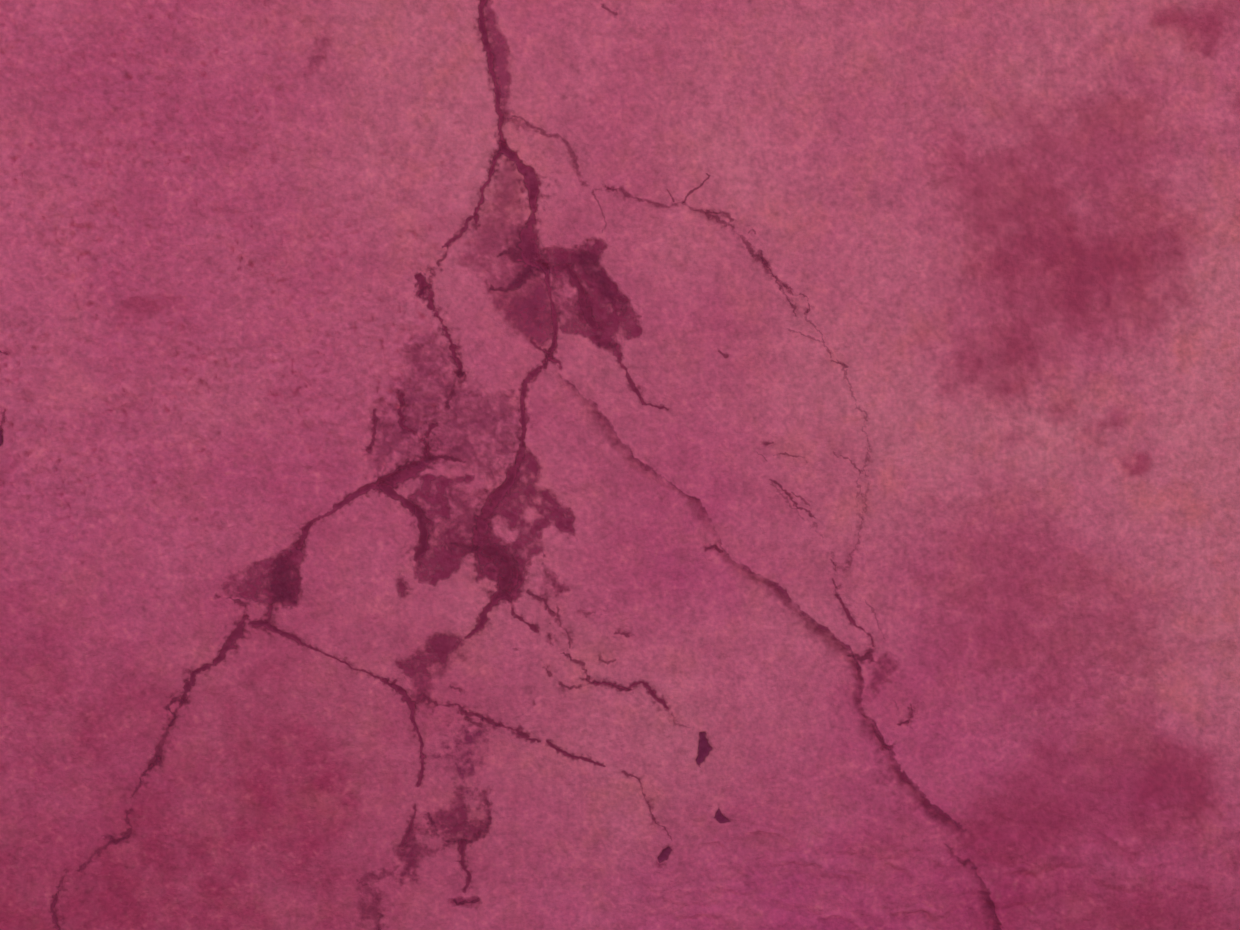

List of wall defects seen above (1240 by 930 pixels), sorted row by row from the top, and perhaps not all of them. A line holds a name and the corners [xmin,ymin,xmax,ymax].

crack [415,0,656,638]
spalling [541,239,642,358]
crack [617,358,667,409]
crack [293,446,431,550]
spalling [366,345,575,644]
spalling [215,546,305,621]
crack [165,614,672,847]
spalling [396,634,463,699]
spalling [546,653,590,689]
crack [705,545,962,829]
crack [451,840,478,906]
crack [966,859,1001,930]